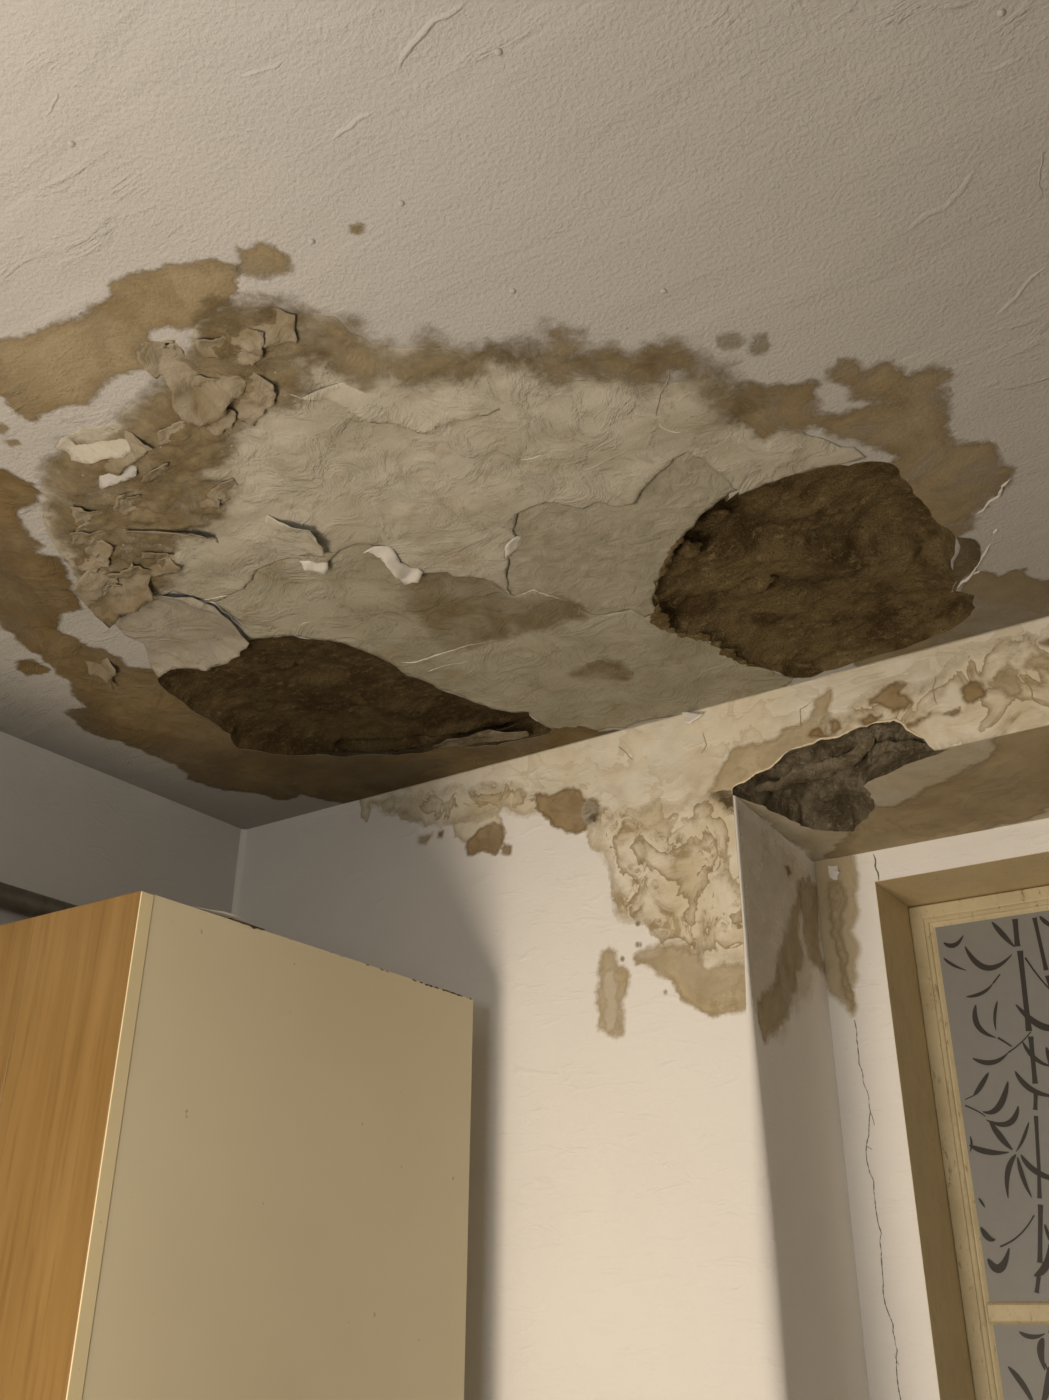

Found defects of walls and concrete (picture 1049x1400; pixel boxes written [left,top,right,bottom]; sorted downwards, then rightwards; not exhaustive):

peeling [41,306,980,757]
spalling [732,719,949,831]